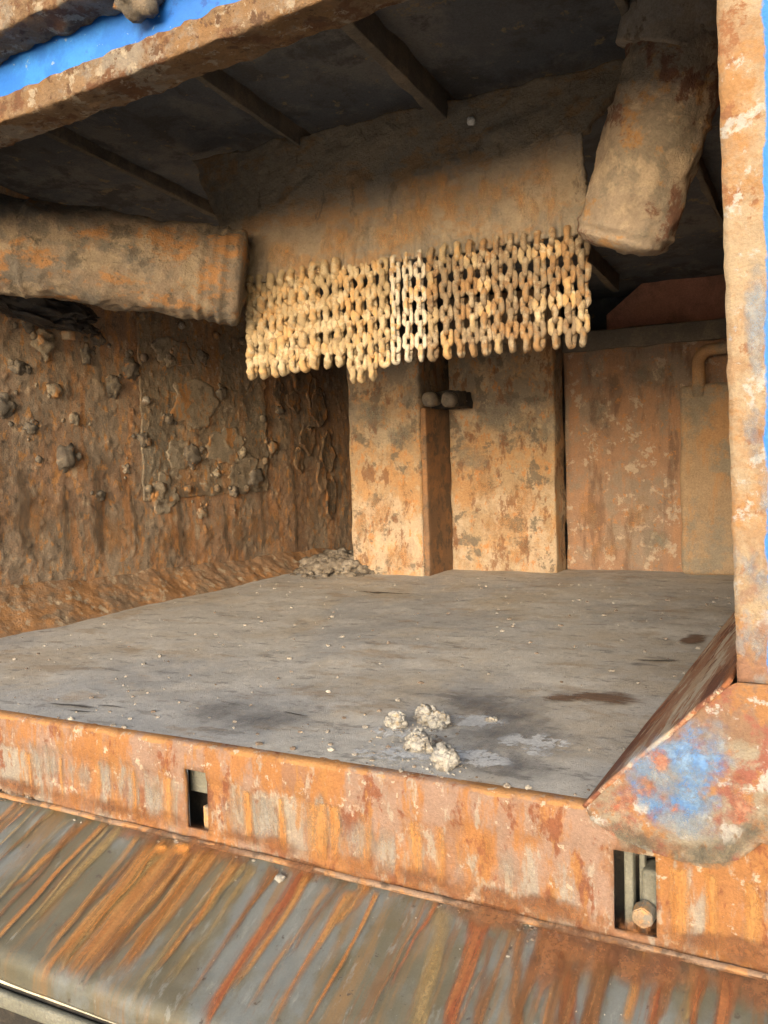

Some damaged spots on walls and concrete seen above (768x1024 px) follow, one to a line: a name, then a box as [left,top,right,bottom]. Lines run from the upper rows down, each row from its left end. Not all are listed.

rust [272,370,337,520]
rust [0,754,382,1021]
rust [403,823,456,892]
peeling [599,728,723,837]